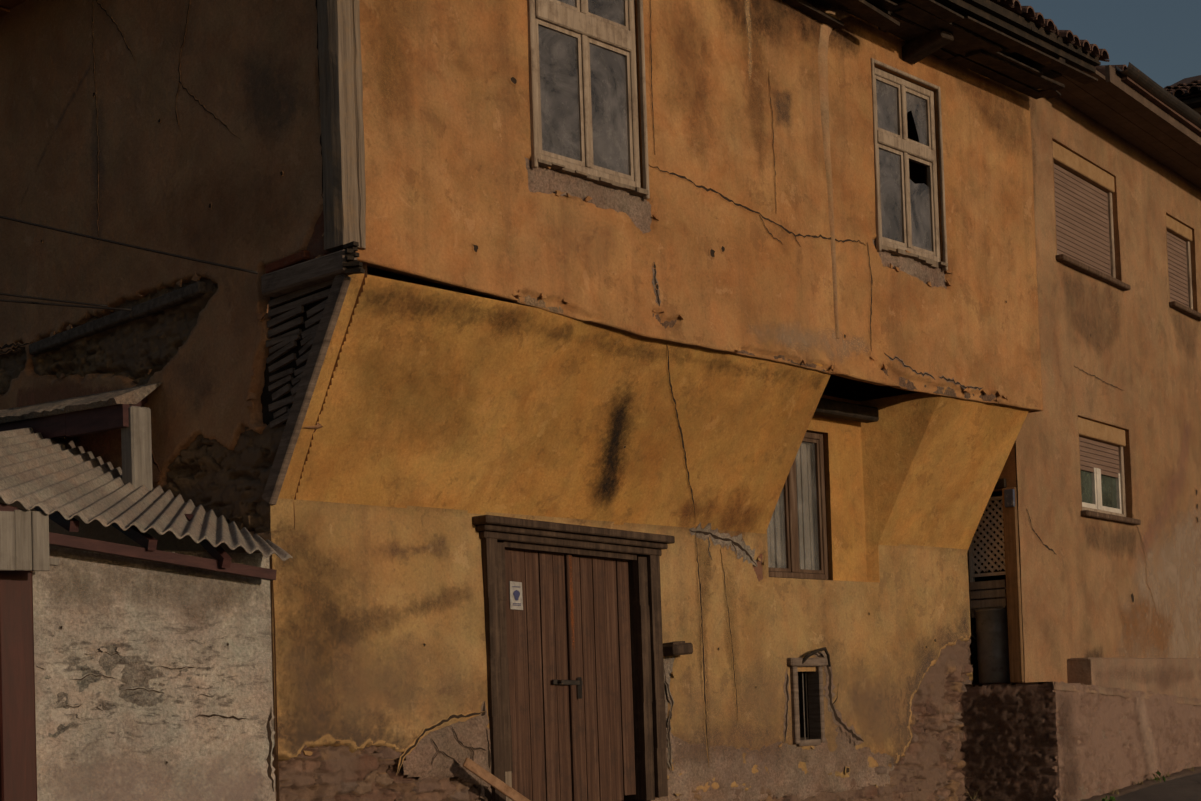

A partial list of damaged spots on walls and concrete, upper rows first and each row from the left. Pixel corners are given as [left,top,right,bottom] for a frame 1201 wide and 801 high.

crack [175,0,240,139]
flaking render [525,157,659,233]
crack [649,0,983,391]
spalling [870,354,1008,403]
crack [666,346,757,765]
crack [195,707,275,792]
crack [782,670,790,742]
crack [814,651,864,745]